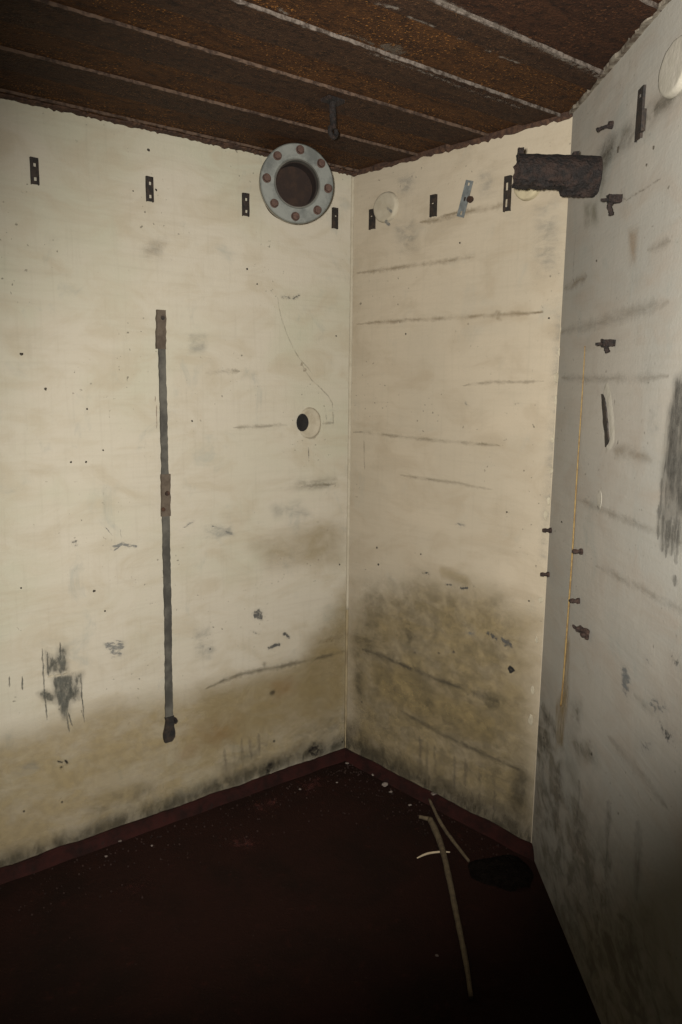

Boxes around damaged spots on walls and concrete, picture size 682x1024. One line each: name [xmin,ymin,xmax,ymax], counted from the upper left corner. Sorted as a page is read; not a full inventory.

corrosion [533,181,591,197]
leakage [0,601,531,868]